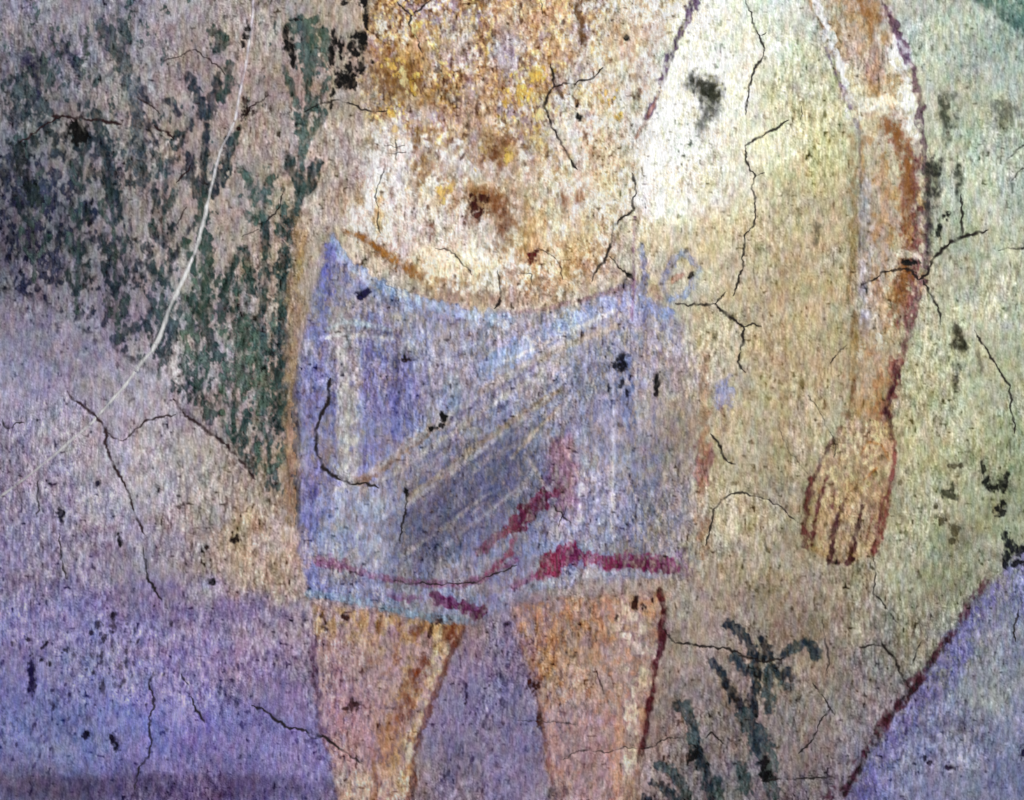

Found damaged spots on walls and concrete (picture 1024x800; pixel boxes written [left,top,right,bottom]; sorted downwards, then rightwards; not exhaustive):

crack [745,0,767,113]
crack [543,64,603,170]
crack [592,173,637,281]
crack [675,106,803,373]
crack [865,195,1024,325]
crack [314,378,378,488]
crack [67,391,255,600]
crack [251,705,359,762]